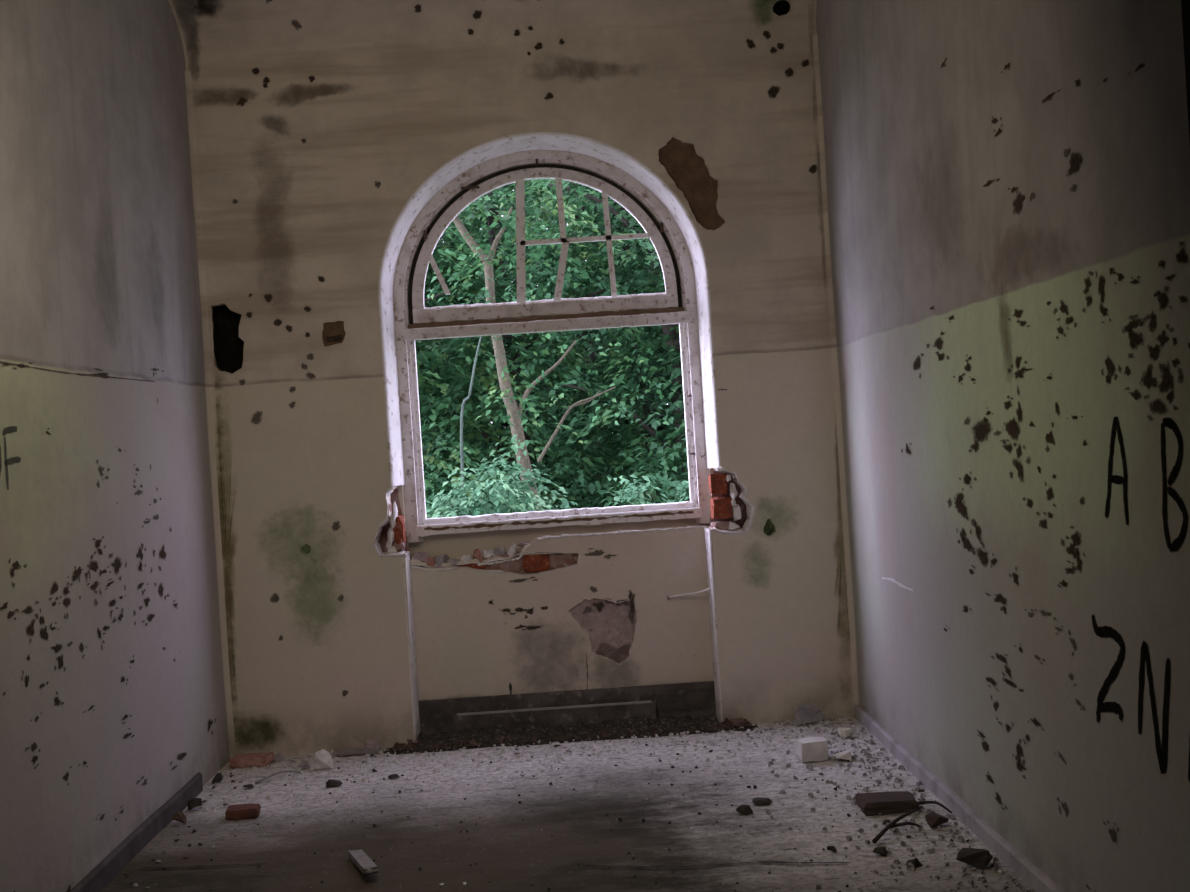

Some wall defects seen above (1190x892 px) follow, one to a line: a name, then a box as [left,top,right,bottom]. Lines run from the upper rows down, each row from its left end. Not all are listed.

spalling [657,135,726,233]
spalling [208,302,248,375]
spalling [320,320,347,347]
peeling [913,306,954,379]
peeling [1047,241,1190,421]
peeling [964,356,1041,481]
peeling [1045,403,1083,452]
spalling [373,466,777,575]
spalling [567,590,639,666]